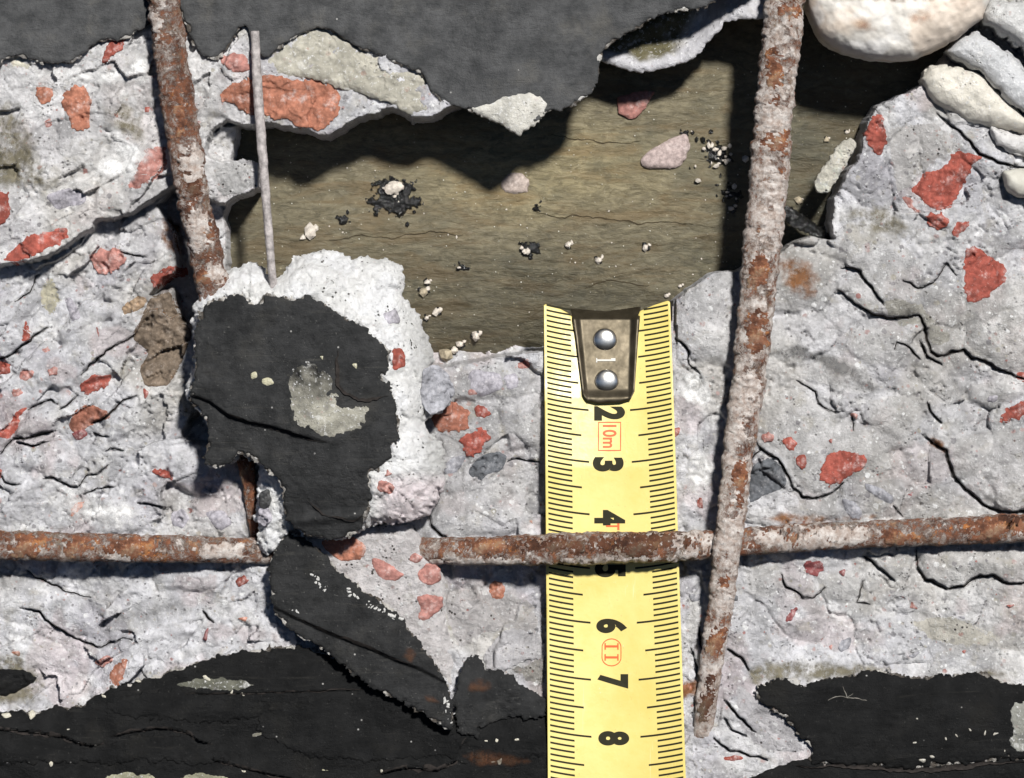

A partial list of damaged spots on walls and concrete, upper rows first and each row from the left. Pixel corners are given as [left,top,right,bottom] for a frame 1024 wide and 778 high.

peeling [0,0,150,69]
peeling [180,0,765,136]
spalling [213,162,259,199]
peeling [814,138,856,193]
corrosion [744,308,770,361]
crack [838,267,1024,379]
crack [0,324,142,495]
crack [923,401,1024,514]
corrosion [1,532,162,562]
corrosion [449,532,700,558]
crack [916,550,1023,590]
corrosion [683,674,717,723]